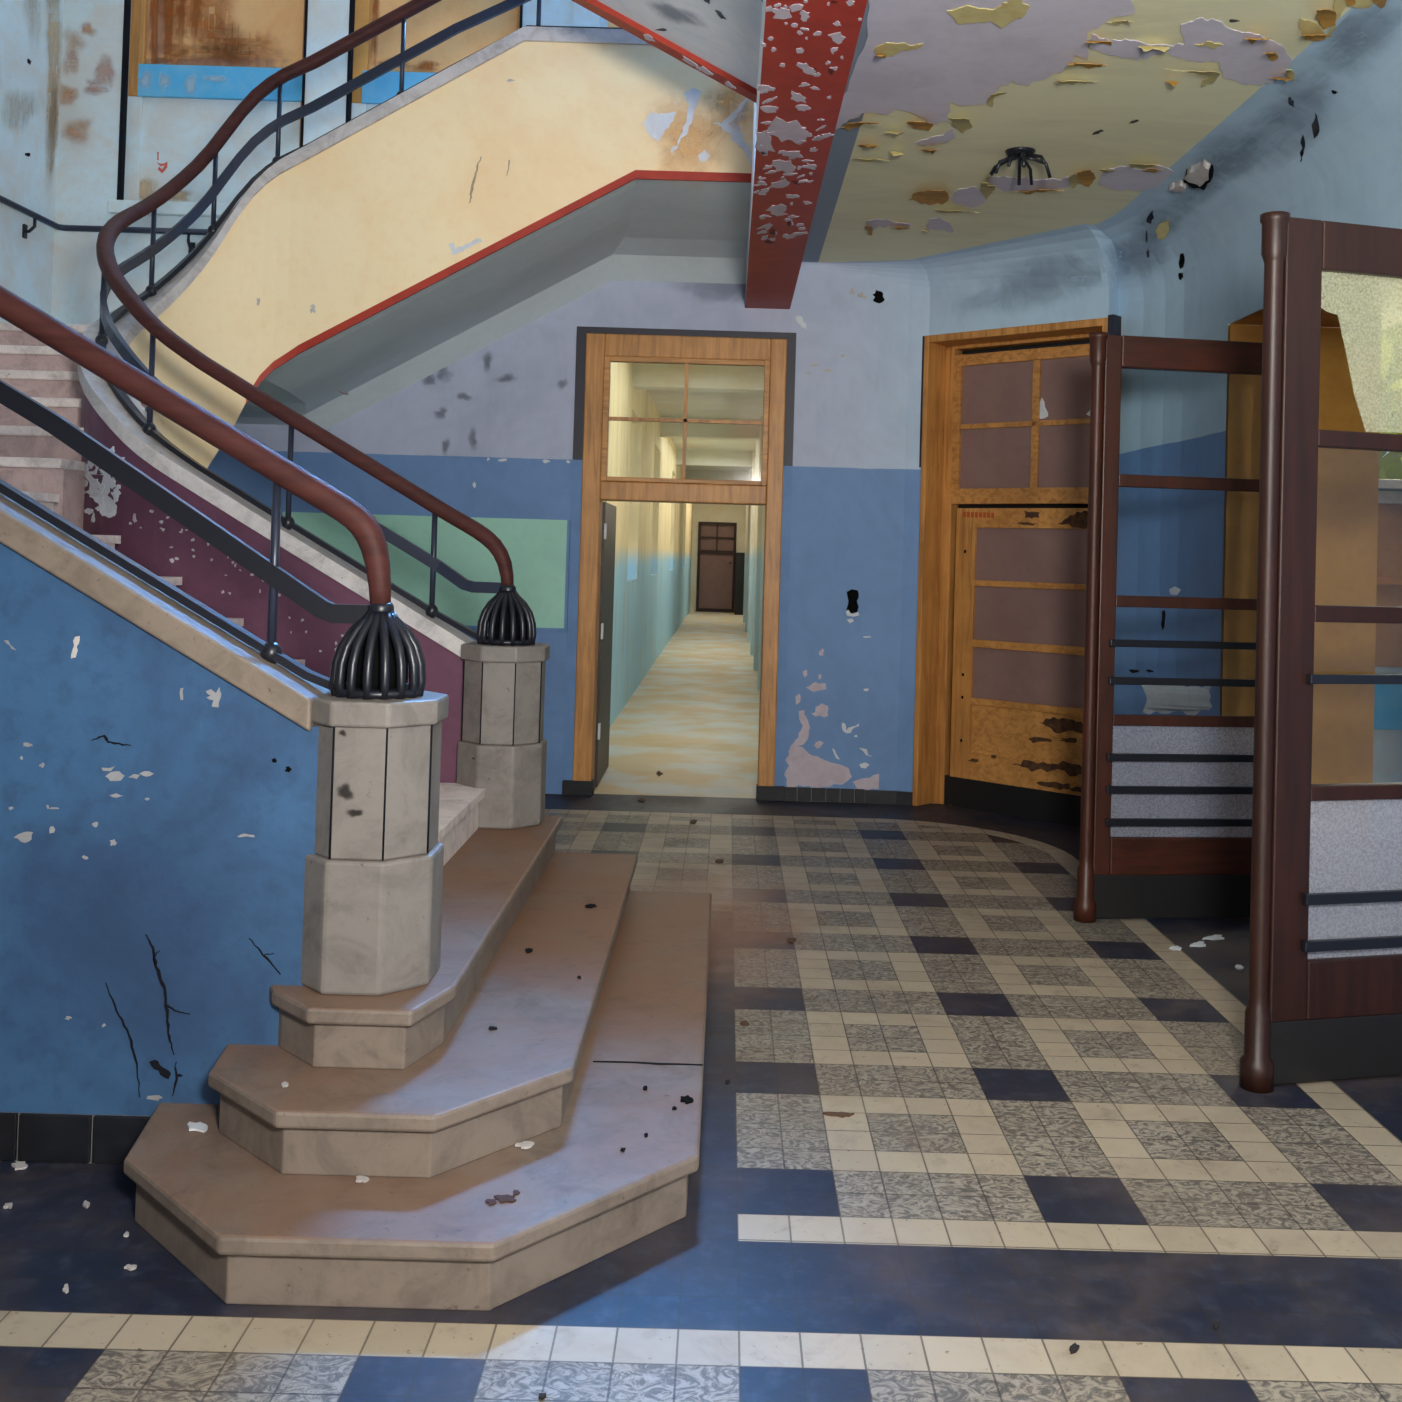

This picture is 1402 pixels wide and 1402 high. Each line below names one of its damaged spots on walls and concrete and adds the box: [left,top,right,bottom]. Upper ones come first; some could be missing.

peeling [1299,0,1387,41]
peeling [644,88,702,154]
peeling [682,0,1295,244]
spalling [1300,113,1319,162]
spalling [849,288,888,305]
peeling [83,461,264,595]
peeling [71,636,80,658]
peeling [206,687,222,707]
peeling [784,670,879,790]
peeling [102,766,154,798]
peeling [14,826,55,843]
crack [105,934,190,1097]